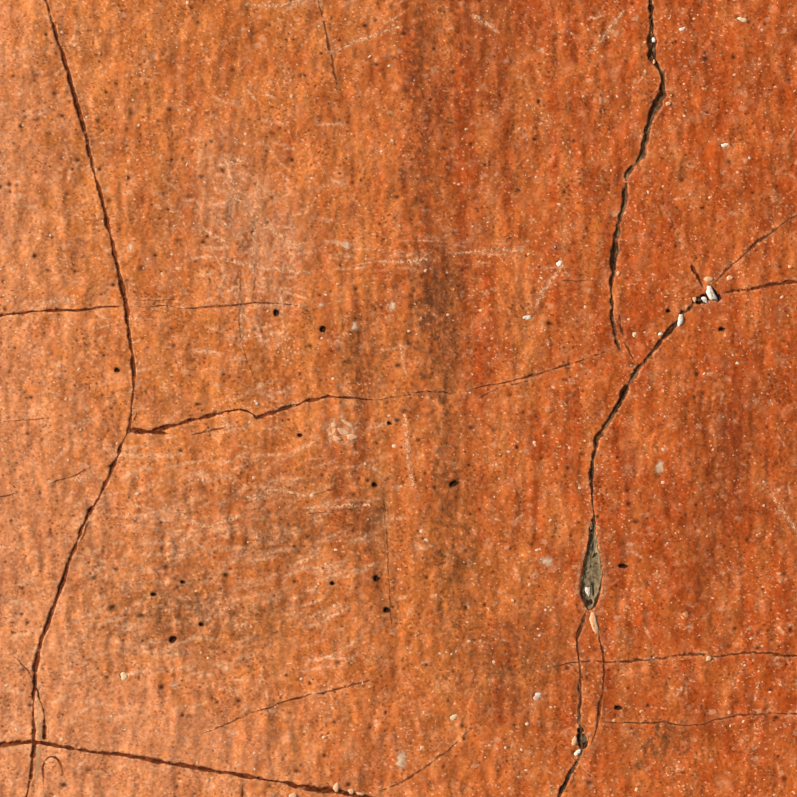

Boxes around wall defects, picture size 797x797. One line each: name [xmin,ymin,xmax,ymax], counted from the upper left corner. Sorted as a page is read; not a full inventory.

crack [0,0,466,797]
spalling [575,524,606,634]
crack [476,0,797,530]
crack [556,612,797,797]